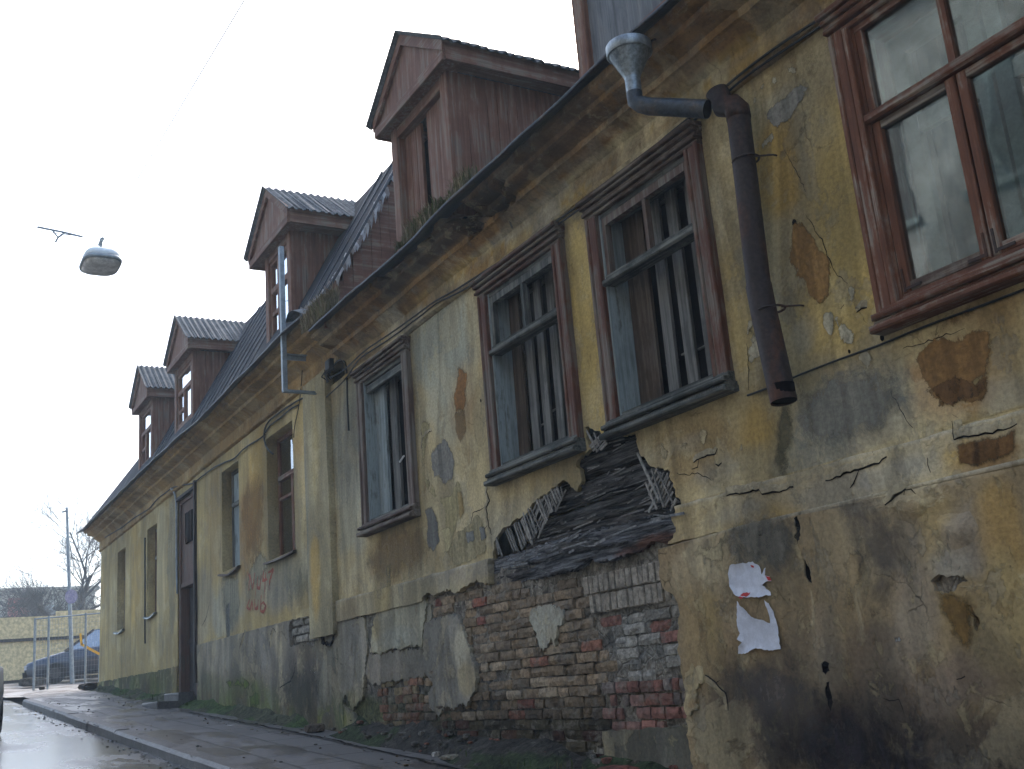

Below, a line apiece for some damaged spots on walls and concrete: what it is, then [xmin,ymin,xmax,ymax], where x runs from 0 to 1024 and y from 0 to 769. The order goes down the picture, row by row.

crack [784,150,868,313]
peeling [789,222,854,345]
peeling [916,329,991,407]
crack [952,414,1017,440]
peeling [421,422,486,566]
crack [825,451,887,488]
crack [882,458,931,505]
damp [729,515,793,570]
spalling [935,575,968,593]
spalling [377,561,687,757]
damp [736,657,938,769]